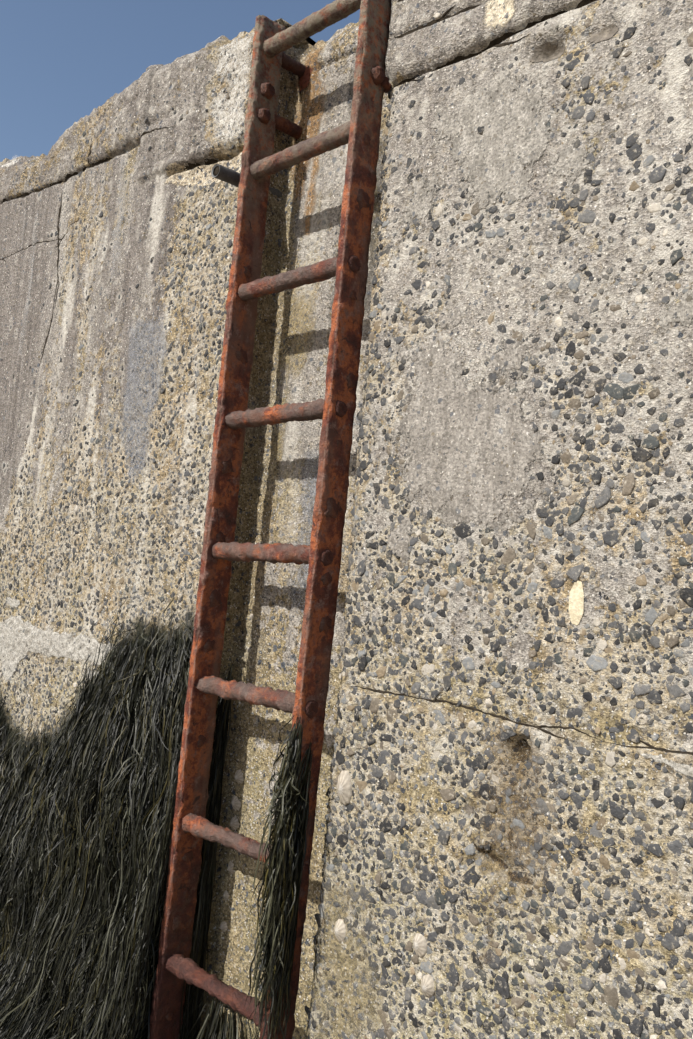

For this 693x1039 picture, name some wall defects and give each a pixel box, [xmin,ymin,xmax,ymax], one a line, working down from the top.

crack [390,0,597,88]
corrosion [295,49,323,141]
corrosion [292,157,318,234]
crack [0,127,169,365]
crack [351,686,693,755]